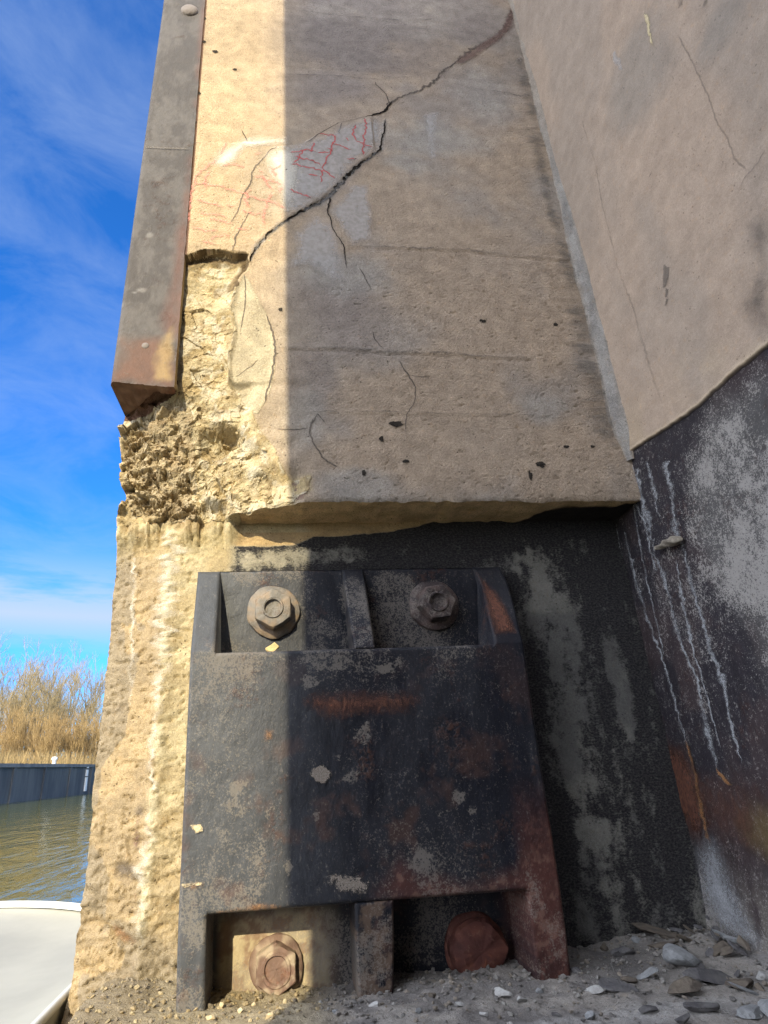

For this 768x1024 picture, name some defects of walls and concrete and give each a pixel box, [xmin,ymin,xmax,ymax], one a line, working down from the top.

crack [231,10,513,401]
spalling [123,249,311,523]
rust [483,583,512,631]
rust [669,743,708,836]
efflorescence [702,846,750,940]